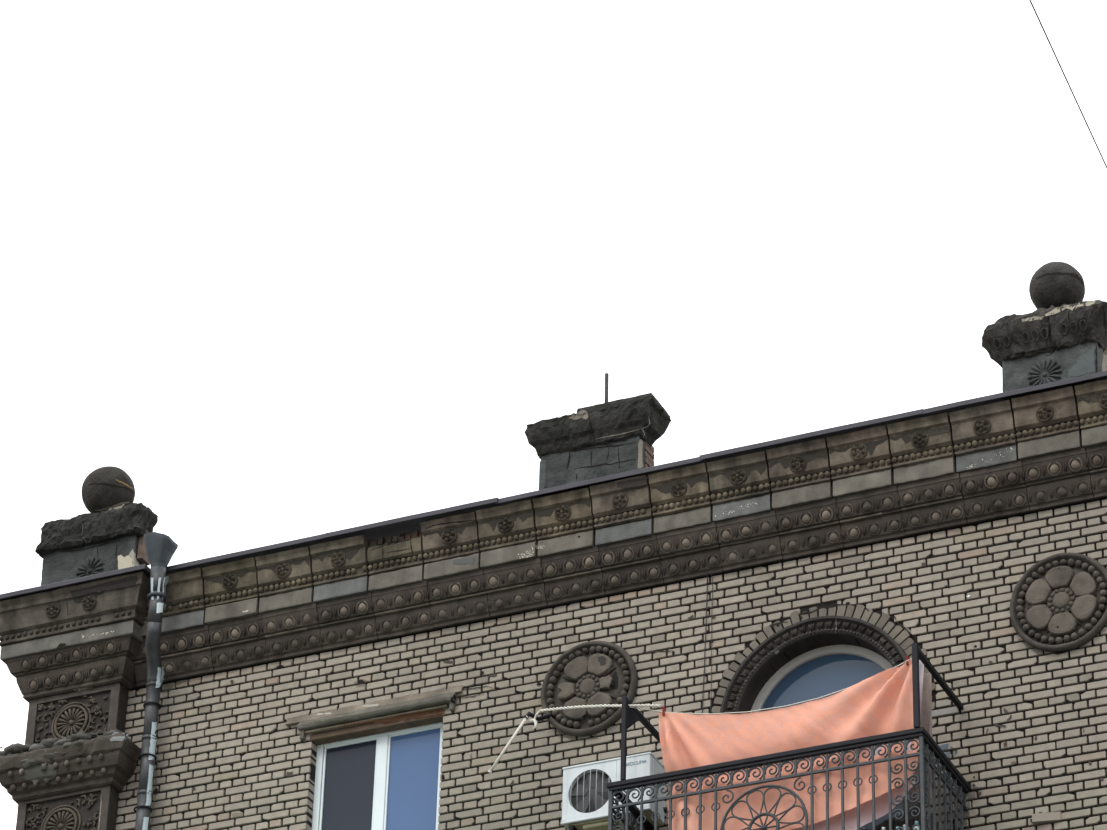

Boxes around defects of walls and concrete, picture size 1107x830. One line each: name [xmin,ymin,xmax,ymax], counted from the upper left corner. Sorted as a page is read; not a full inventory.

spalling [569,410,588,420]
flaking render [644,442,655,468]
flaking render [118,530,169,613]